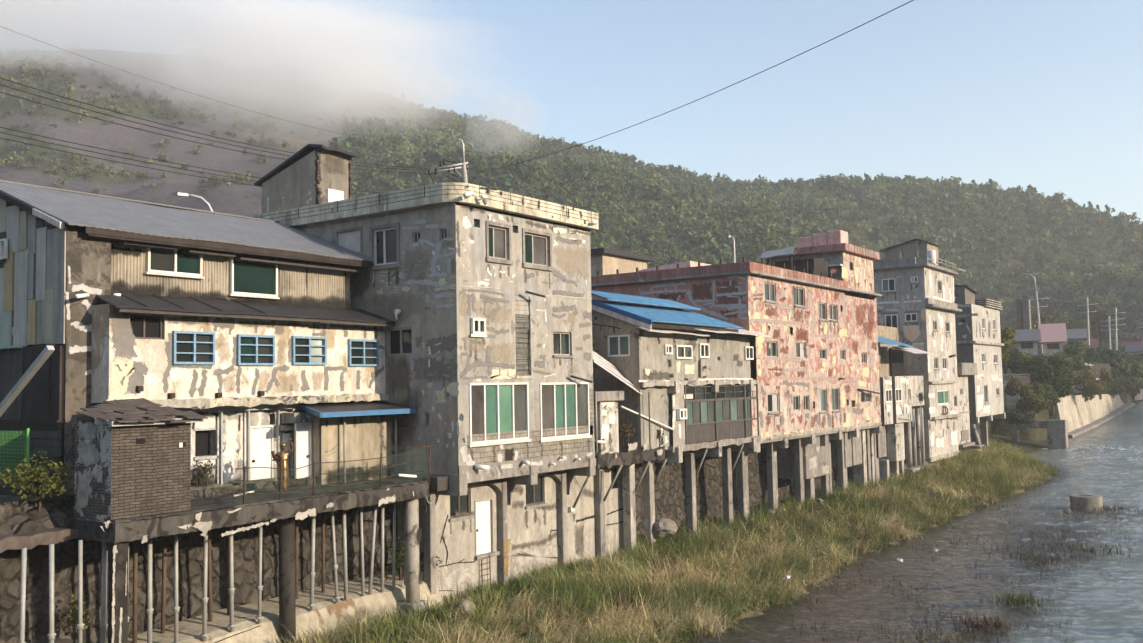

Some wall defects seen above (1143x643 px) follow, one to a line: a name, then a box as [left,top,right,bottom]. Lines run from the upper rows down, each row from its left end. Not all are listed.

damp [111,247,141,256]
damp [111,268,399,308]
peeling [372,216,475,301]
peeling [463,265,515,286]
peeling [546,224,586,246]
damp [239,322,383,331]
peeling [698,297,794,381]
peeling [107,341,216,401]
damp [326,359,429,451]
peeling [422,342,465,448]
peeling [476,368,516,382]
crack [439,514,475,591]